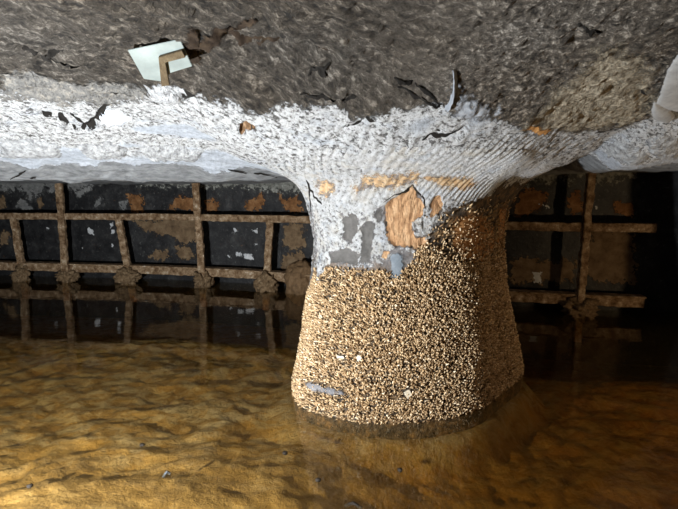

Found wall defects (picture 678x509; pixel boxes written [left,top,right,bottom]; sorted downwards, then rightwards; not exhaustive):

rust [201,197,219,213]
rust [244,192,265,214]
rust [278,192,304,214]
rust [280,223,308,271]
spalling [329,187,443,279]
rust [508,254,578,286]
rust [588,232,639,286]